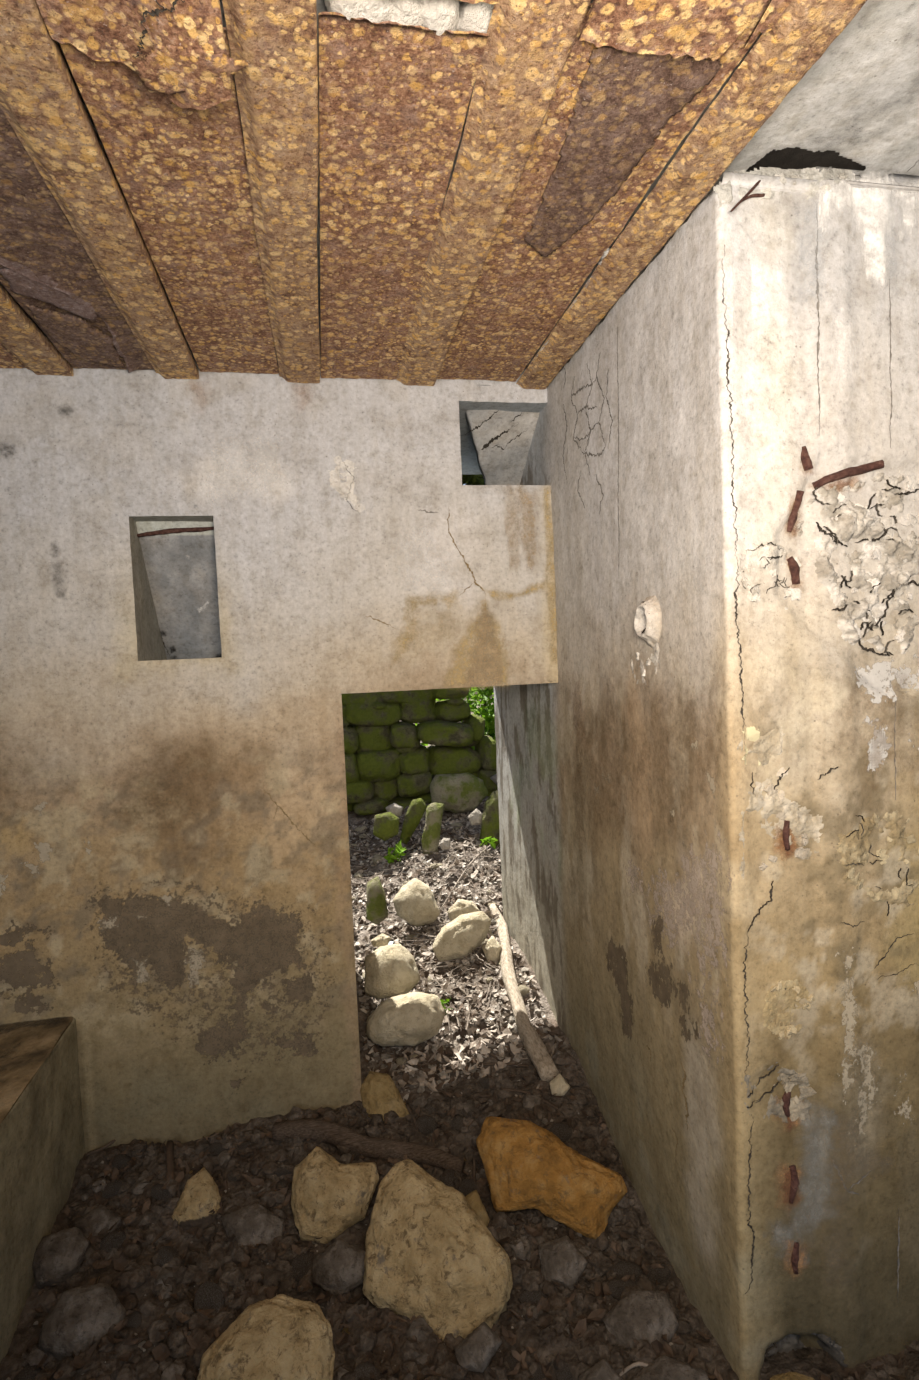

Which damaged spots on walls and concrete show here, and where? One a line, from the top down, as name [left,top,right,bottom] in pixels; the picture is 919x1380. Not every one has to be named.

crack [419,506,486,612]
crack [562,328,619,558]
crack [722,245,745,742]
spalling [735,446,919,771]
crack [742,931,750,1071]
crack [745,1114,755,1294]